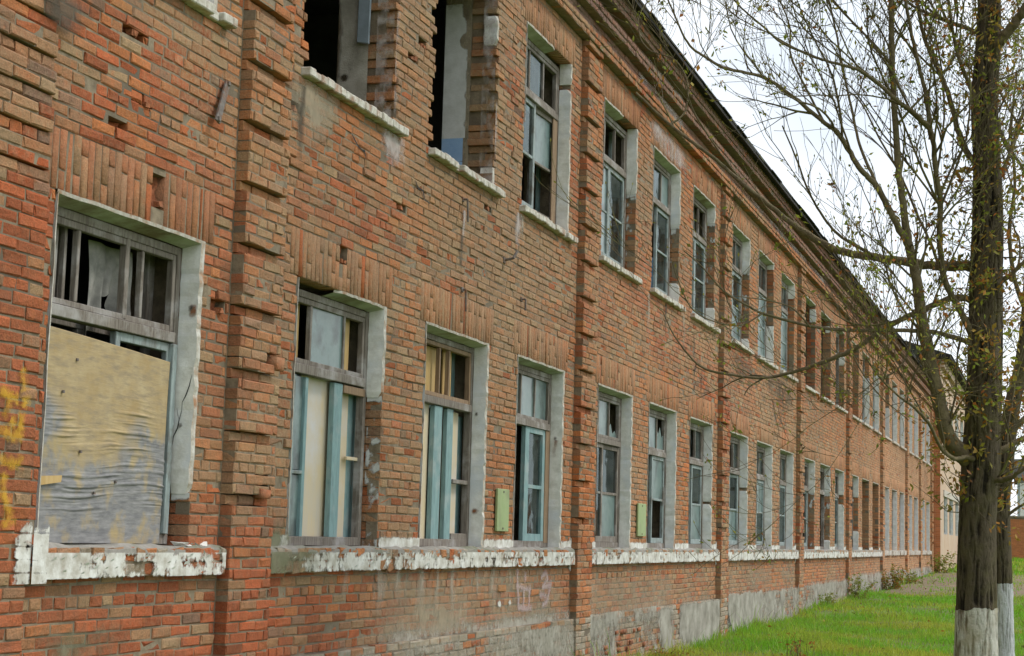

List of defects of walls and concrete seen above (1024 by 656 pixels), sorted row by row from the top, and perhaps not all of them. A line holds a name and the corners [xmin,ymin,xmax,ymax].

crack [172,376,192,445]
peeling [33,553,226,580]
peeling [294,537,575,572]
peeling [592,541,882,565]